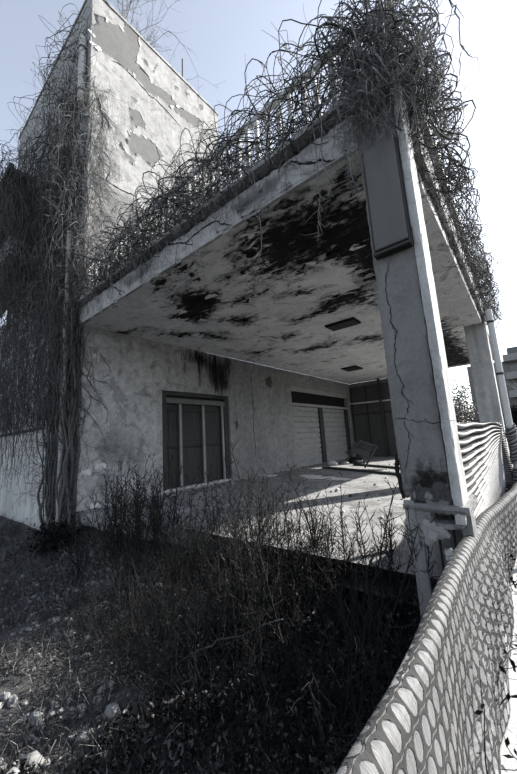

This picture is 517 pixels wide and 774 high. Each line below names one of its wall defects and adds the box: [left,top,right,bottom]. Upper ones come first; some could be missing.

flaking render [88,13,205,129]
flaking render [119,96,166,169]
water stain [151,162,377,341]
water stain [184,350,230,393]
crack [385,255,454,471]
water stain [440,316,470,367]